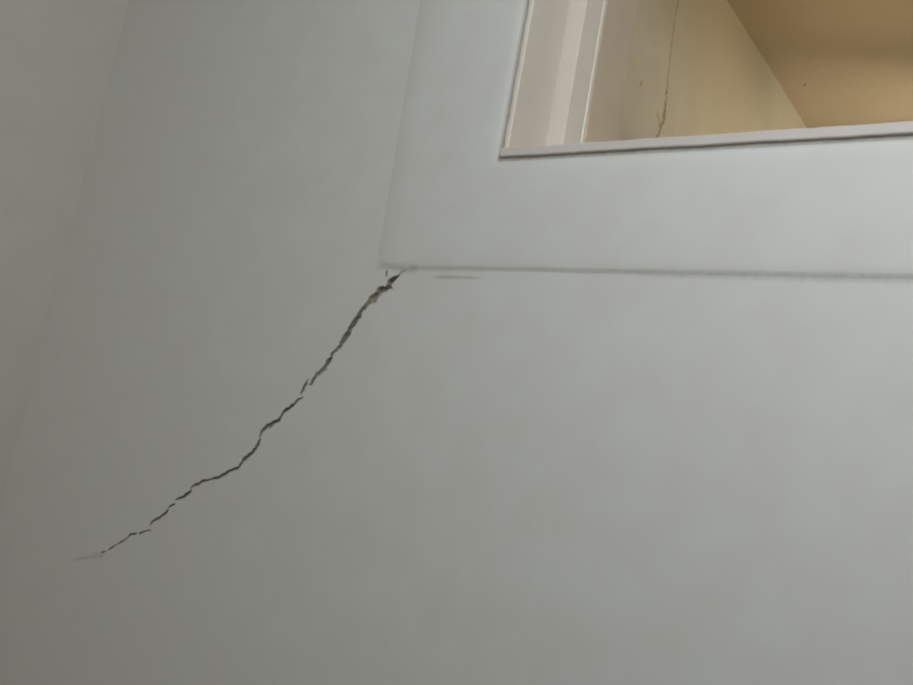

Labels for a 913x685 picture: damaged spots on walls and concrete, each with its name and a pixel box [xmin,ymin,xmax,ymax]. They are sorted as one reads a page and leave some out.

crack [499,0,913,162]
crack [101,270,400,553]